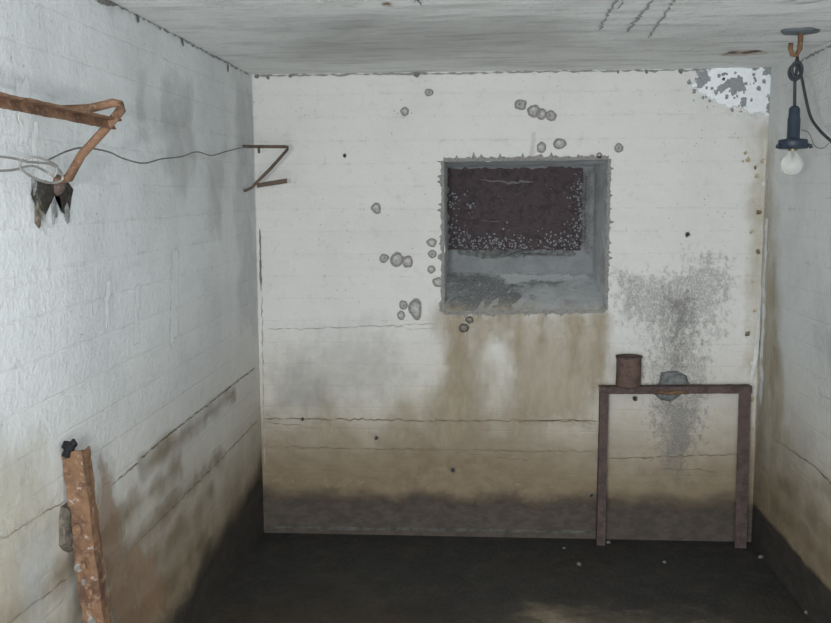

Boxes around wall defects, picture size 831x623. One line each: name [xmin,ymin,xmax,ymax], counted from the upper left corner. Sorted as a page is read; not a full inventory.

crack [120,6,711,80]
crack [599,0,676,38]
peeling [687,67,771,124]
leakage [133,316,736,623]
crack [770,435,831,484]
leakage [747,476,831,623]